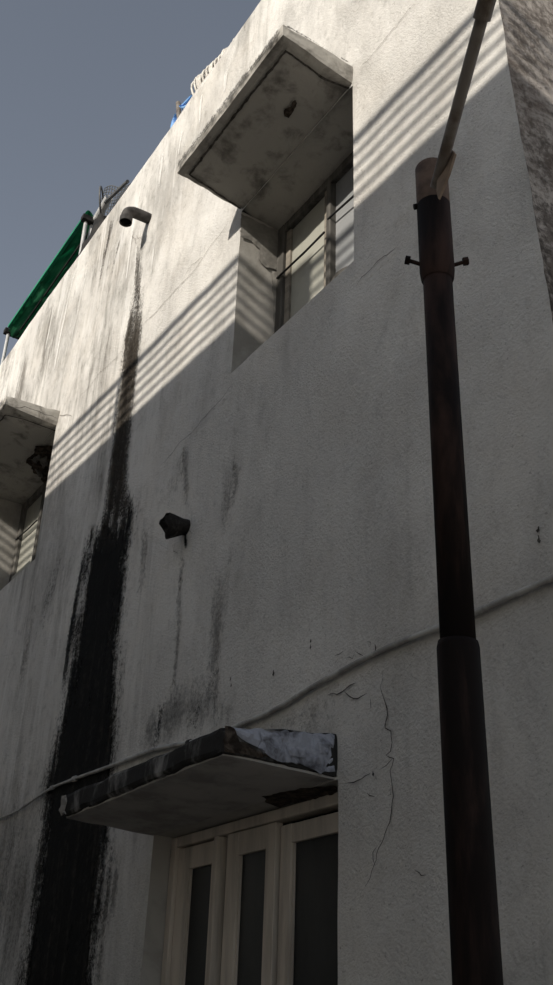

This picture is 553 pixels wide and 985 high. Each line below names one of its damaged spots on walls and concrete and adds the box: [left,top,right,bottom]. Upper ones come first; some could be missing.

damp [0,226,154,985]
crack [328,674,394,900]